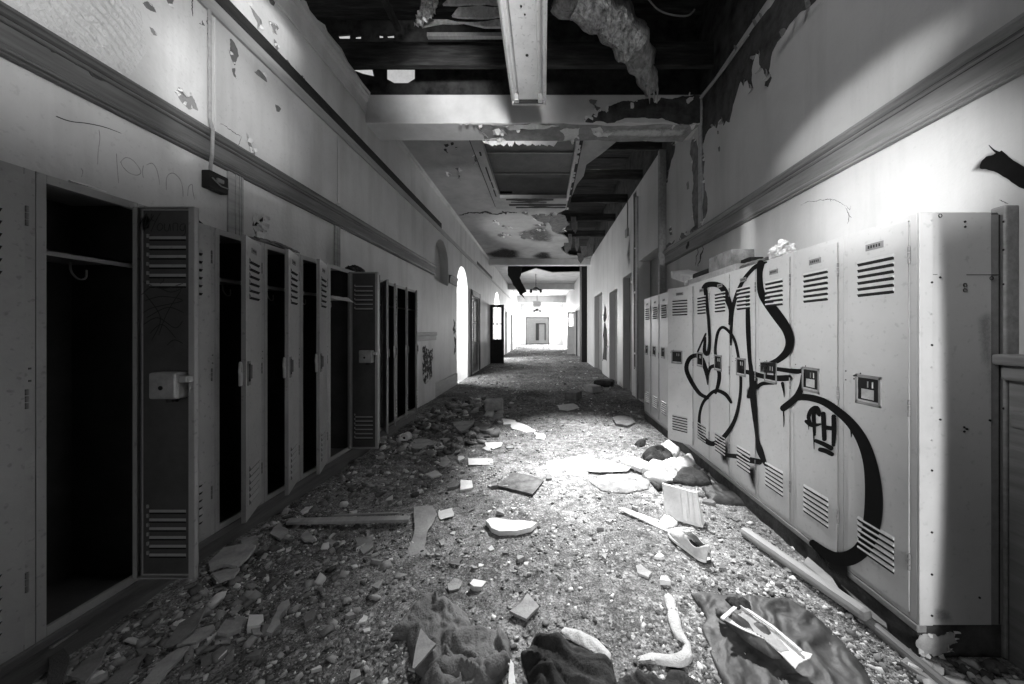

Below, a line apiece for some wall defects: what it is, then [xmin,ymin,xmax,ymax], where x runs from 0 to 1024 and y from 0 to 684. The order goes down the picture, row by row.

peeling [249,3,289,62]
peeling [230,39,239,79]
peeling [175,87,198,111]
flaking render [460,0,816,248]
peeling [915,631,961,660]